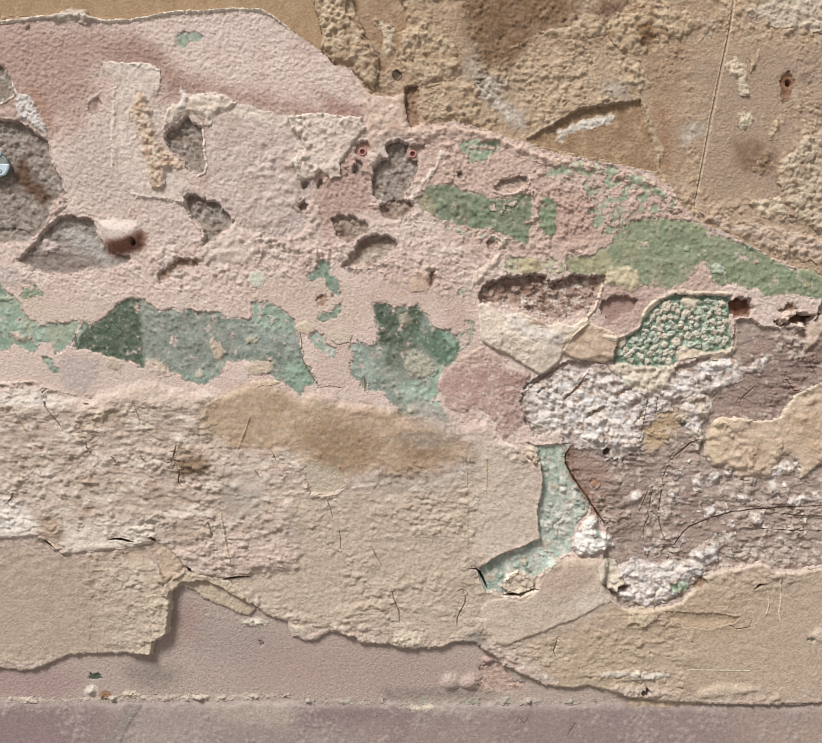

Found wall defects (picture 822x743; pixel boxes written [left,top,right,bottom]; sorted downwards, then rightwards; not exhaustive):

rust [106,234,145,254]
spalling [0,0,822,298]
crack [691,0,737,209]
water stain [216,393,475,492]
peeling [0,216,822,708]
crack [637,436,822,562]